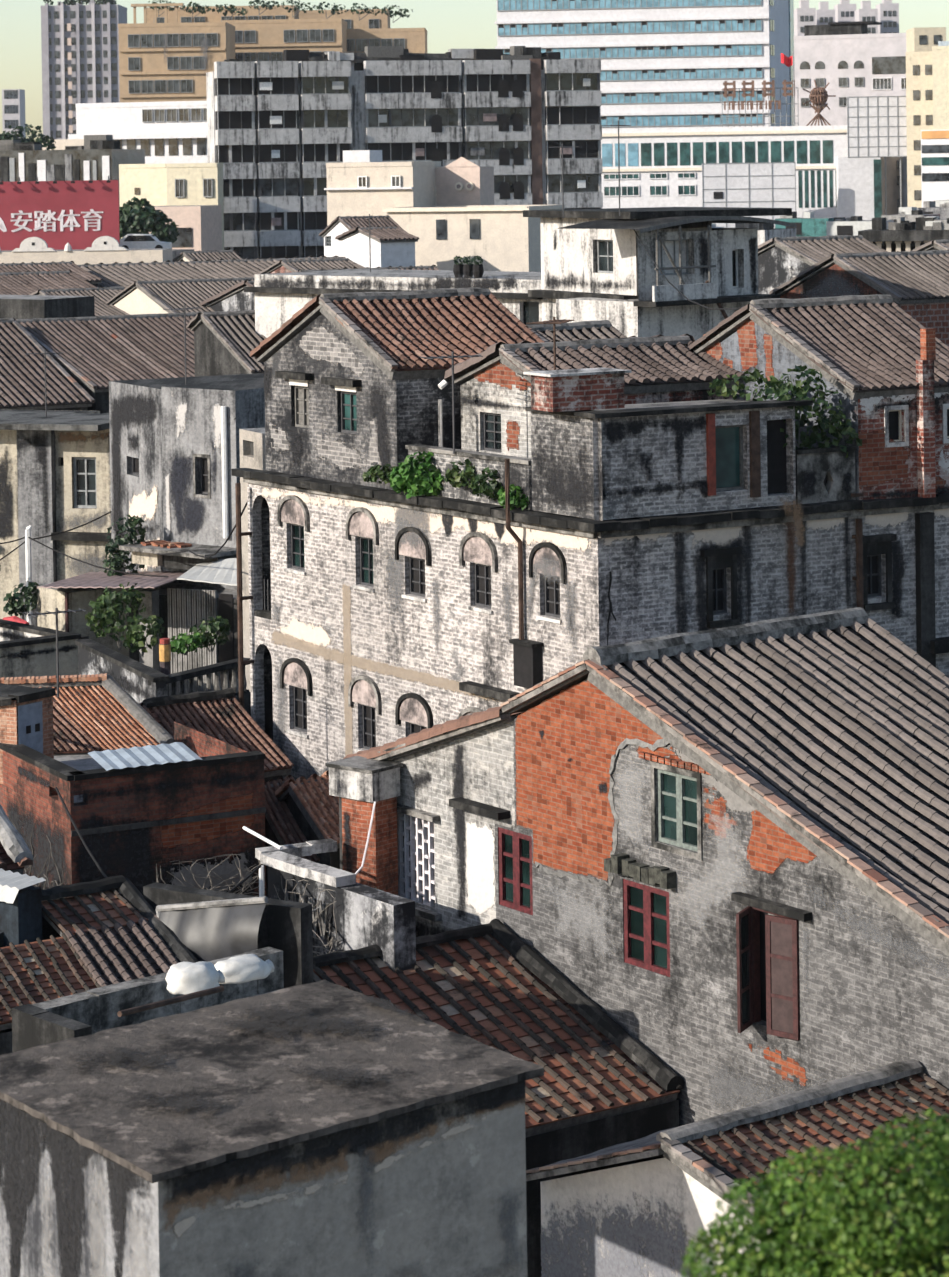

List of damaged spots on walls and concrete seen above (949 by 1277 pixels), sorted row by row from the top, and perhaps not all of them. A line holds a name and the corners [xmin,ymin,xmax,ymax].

leakage [0,394,206,575]
leakage [210,404,221,491]
leakage [535,416,707,510]
peeling [859,429,911,488]
peeling [936,445,949,488]
flaking render [515,680,682,886]
flaking render [746,810,817,874]
leakage [225,1004,392,1040]
leakage [0,1099,150,1277]
leakage [164,1081,526,1239]
leakage [540,1193,693,1277]